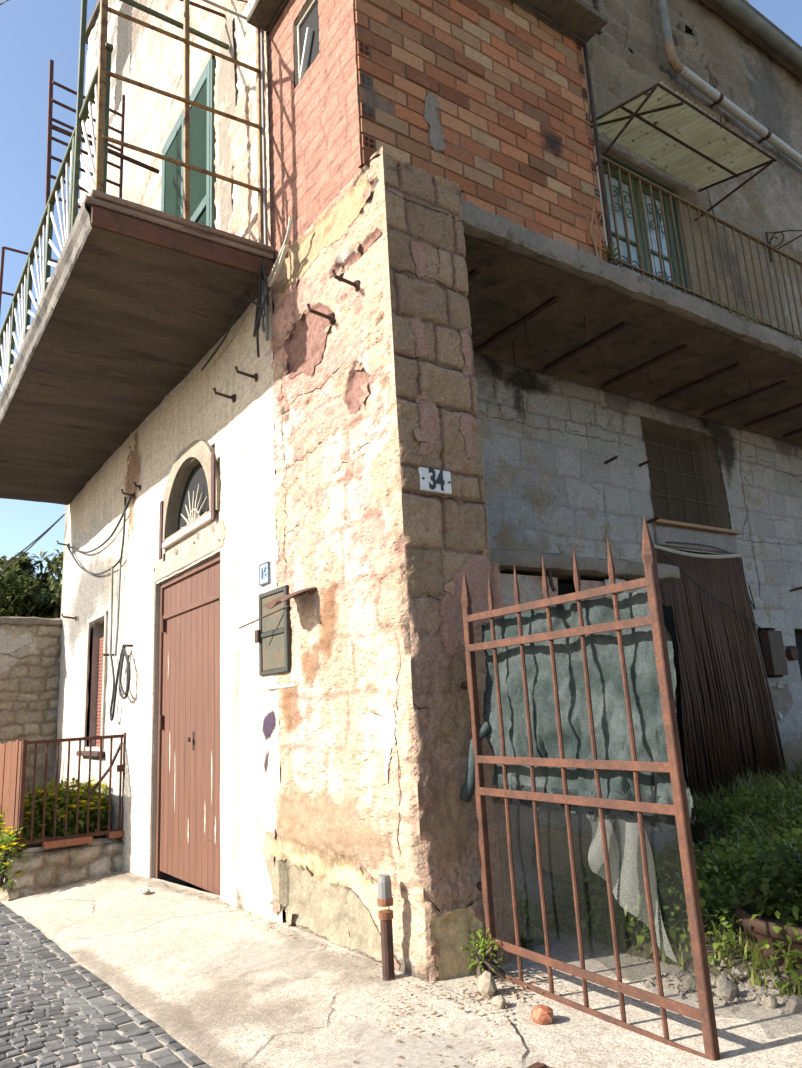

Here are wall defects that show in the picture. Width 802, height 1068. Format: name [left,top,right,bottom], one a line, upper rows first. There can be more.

spalling [283,302,334,379]
spalling [343,362,370,414]
damp [487,359,549,411]